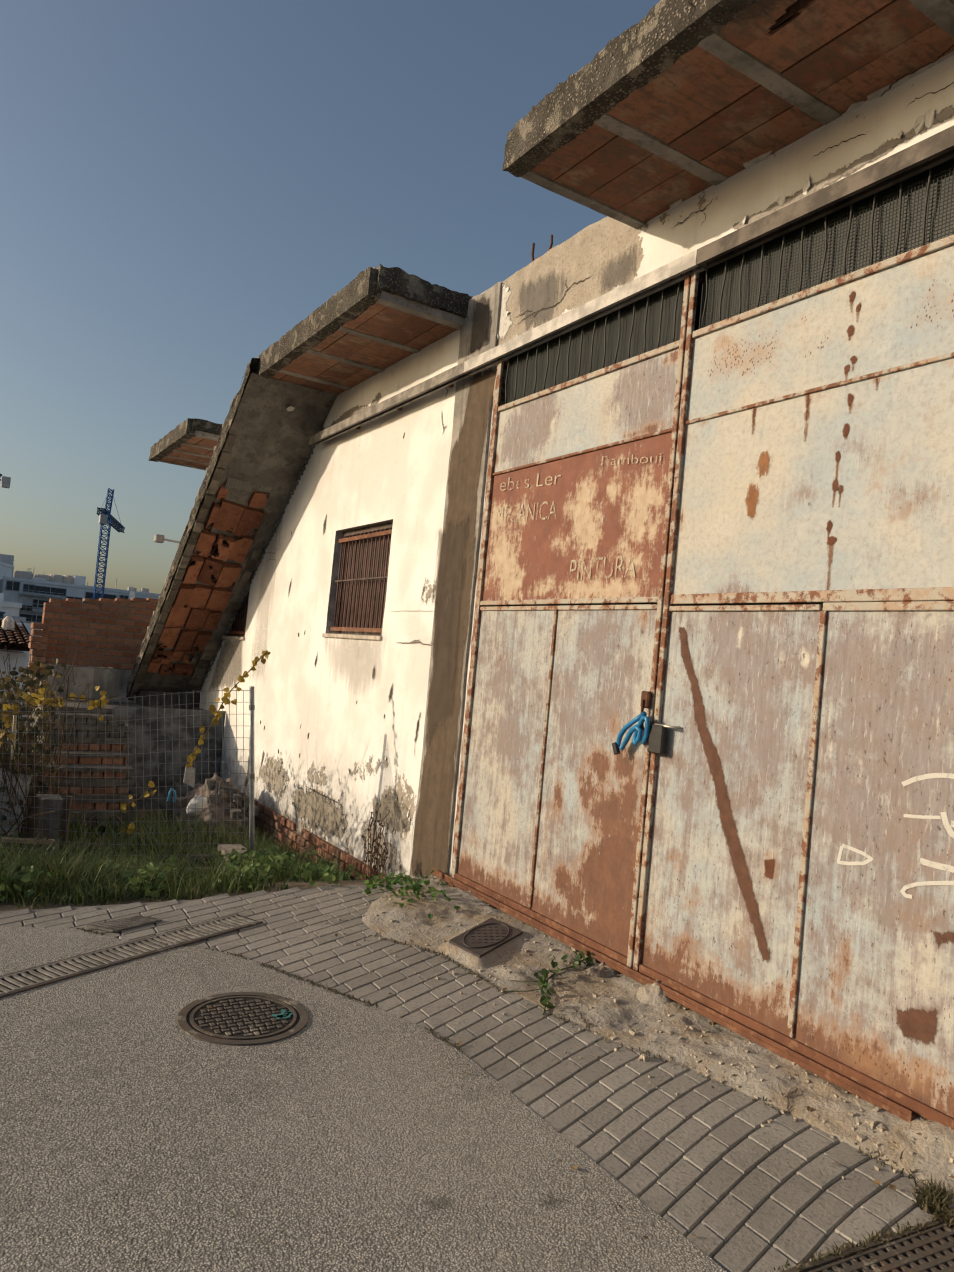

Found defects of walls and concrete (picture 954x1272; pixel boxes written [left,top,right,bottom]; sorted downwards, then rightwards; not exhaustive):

peeling [733,100,954,230]
rust [847,291,861,340]
rust [832,356,857,507]
spalling [210,535,229,581]
rust [826,520,837,590]
peeling [259,749,411,877]
rust [679,627,774,962]
rust [933,931,954,948]
rust [896,1008,937,1044]